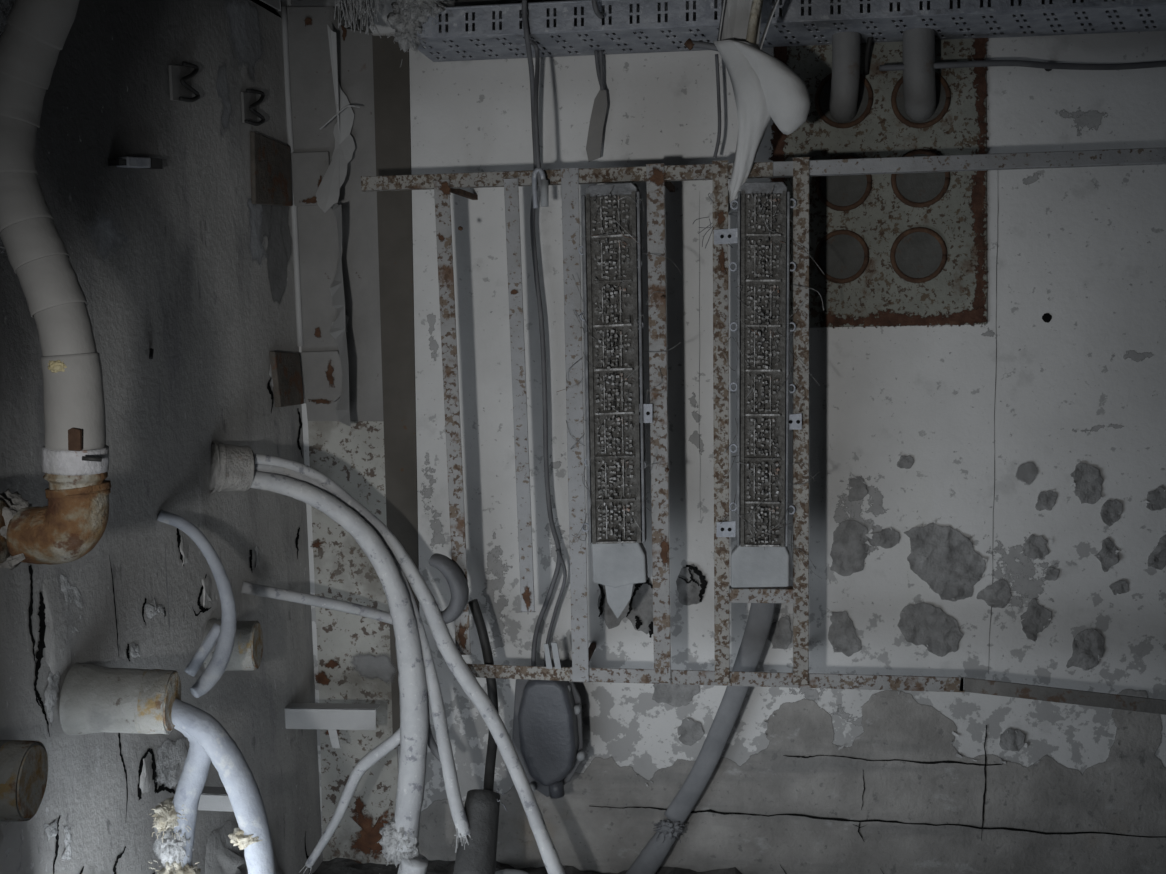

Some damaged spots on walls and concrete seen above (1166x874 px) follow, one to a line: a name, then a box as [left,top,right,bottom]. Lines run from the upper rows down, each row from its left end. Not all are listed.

corrosion [768,121,788,162]
corrosion [970,34,989,154]
corrosion [820,170,988,329]
crack [28,565,86,736]
crack [109,528,212,661]
spalling [828,518,1011,657]
crack [118,733,188,815]
corrosion [351,796,395,863]
peeling [493,785,545,869]
peeling [534,757,695,874]
crack [591,725,1166,841]
peeling [660,689,1166,874]